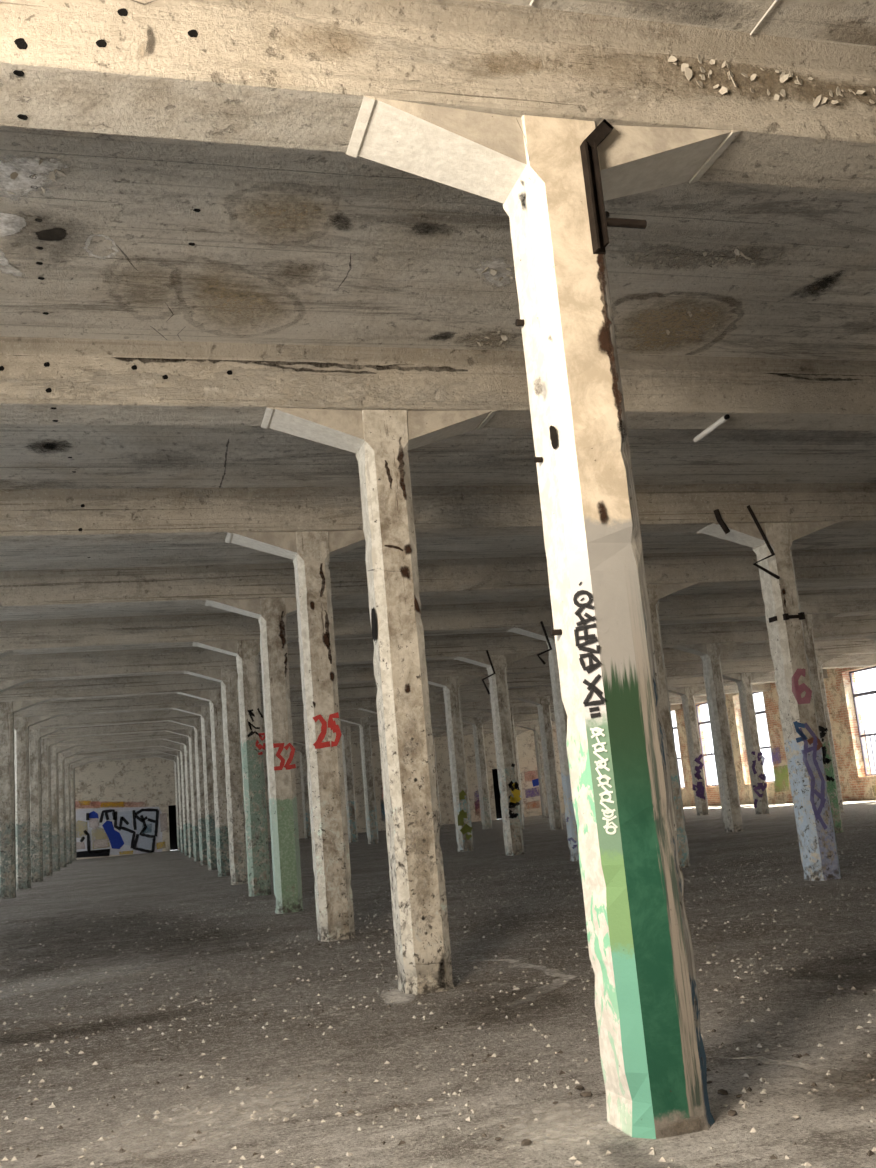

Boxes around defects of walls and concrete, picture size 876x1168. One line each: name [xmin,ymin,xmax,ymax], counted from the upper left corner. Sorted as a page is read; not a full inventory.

peeling [668,54,876,108]